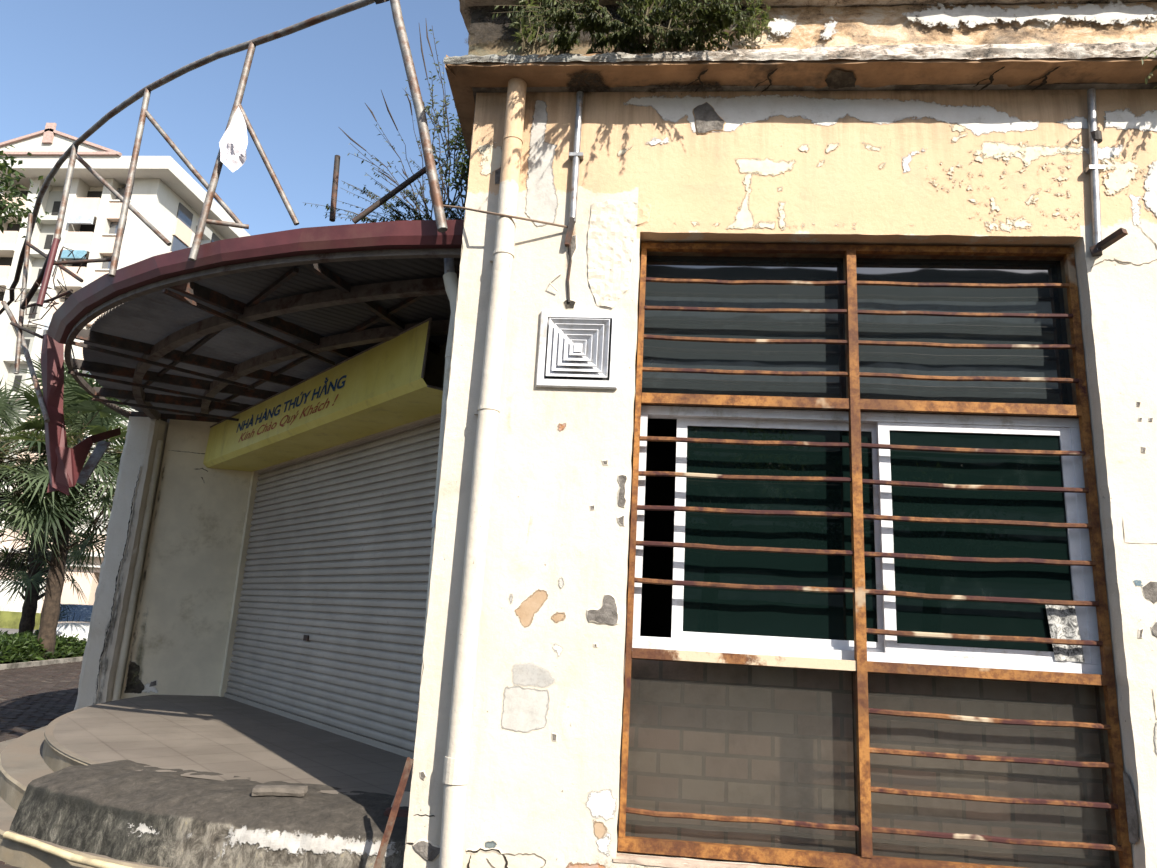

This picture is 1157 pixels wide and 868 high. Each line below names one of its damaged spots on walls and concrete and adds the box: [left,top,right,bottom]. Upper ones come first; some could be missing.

peeling [767,13,796,40]
peeling [820,15,839,39]
peeling [902,0,1157,29]
peeling [624,70,1157,233]
peeling [509,578,566,628]
flaking render [586,594,619,626]
flaking render [1134,580,1157,604]
flaking render [1137,621,1157,639]
peeling [501,685,558,742]
peeling [566,789,618,868]
crack [466,846,546,868]